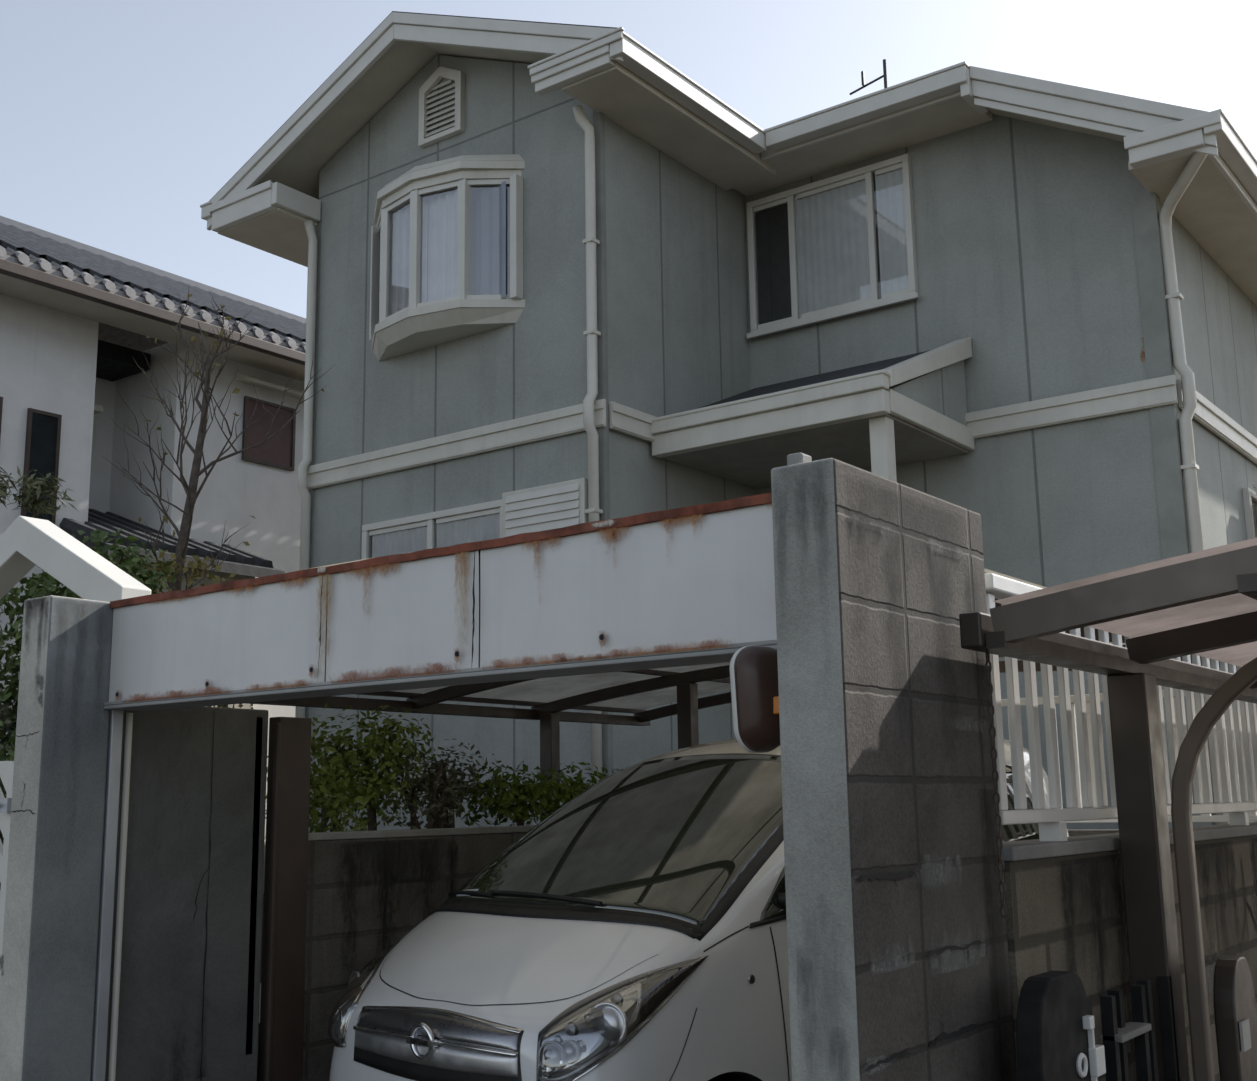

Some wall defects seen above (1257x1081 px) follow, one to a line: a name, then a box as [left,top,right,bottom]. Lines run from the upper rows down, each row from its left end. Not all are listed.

rust [337,650,459,683]
rust [494,633,724,669]
crack [924,940,986,960]